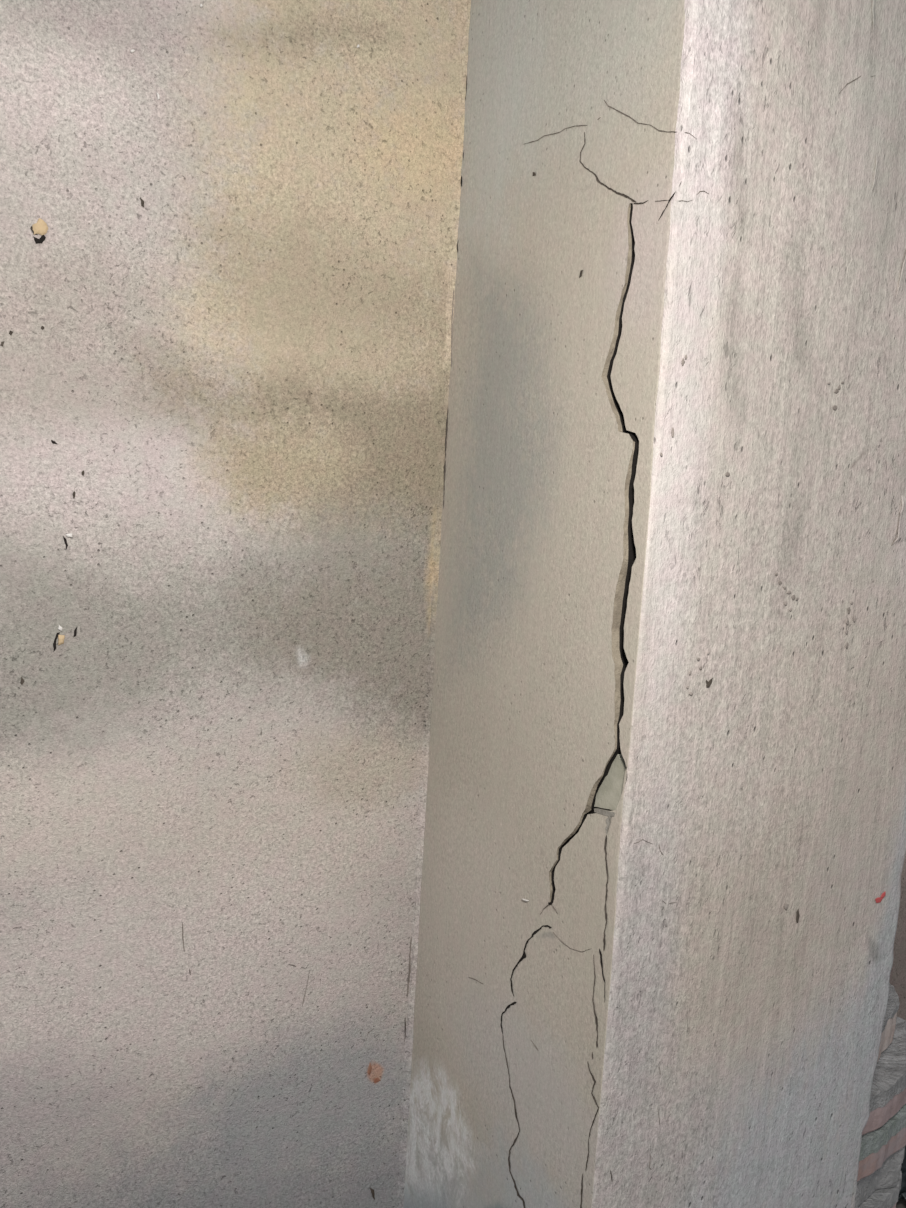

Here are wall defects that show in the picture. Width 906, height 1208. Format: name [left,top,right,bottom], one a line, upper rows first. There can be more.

crack [469,100,709,1208]